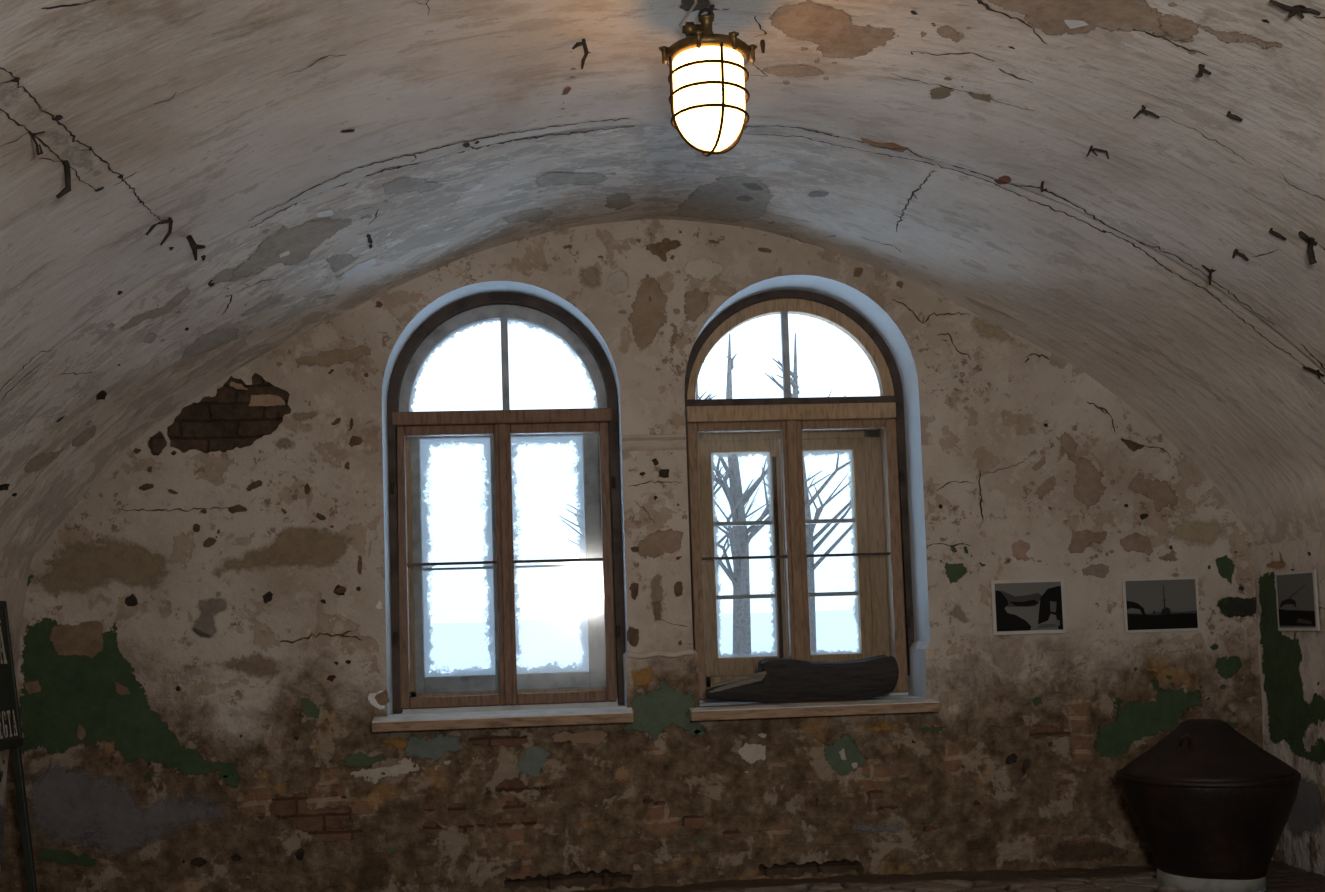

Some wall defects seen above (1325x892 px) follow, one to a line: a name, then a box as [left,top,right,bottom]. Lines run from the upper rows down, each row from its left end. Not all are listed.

crack [42,0,95,9]
peeling [763,0,898,85]
peeling [988,0,1283,54]
crack [0,67,164,221]
peeling [208,209,377,299]
crack [744,116,1325,384]
flaking render [134,373,317,494]
flaking render [228,480,262,514]
peeling [1029,423,1179,578]
peeling [19,617,245,788]
peeling [1094,643,1242,764]
peeling [1208,551,1325,765]